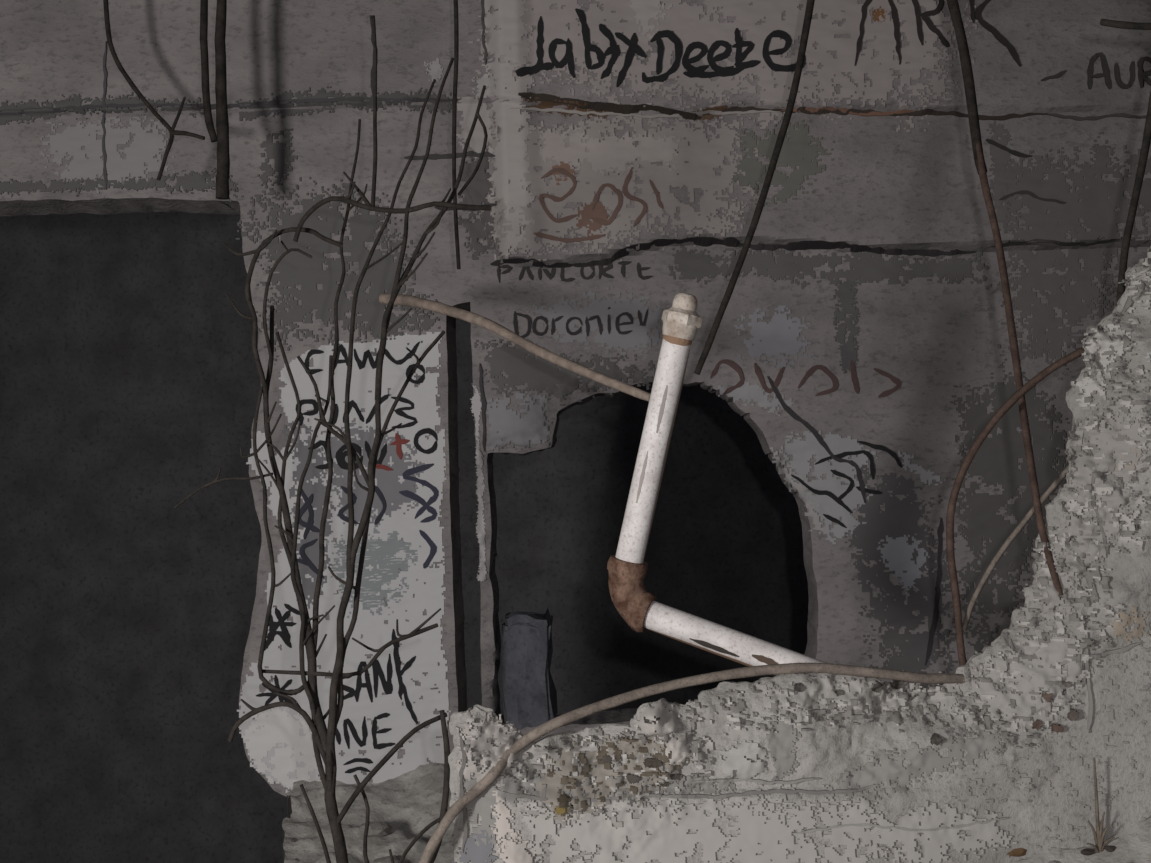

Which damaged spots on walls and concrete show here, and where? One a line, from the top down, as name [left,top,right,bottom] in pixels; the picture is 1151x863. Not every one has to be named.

crack [510,92,1147,158]
crack [999,190,1066,204]
crack [490,237,1119,268]
peeling [237,0,1151,863]